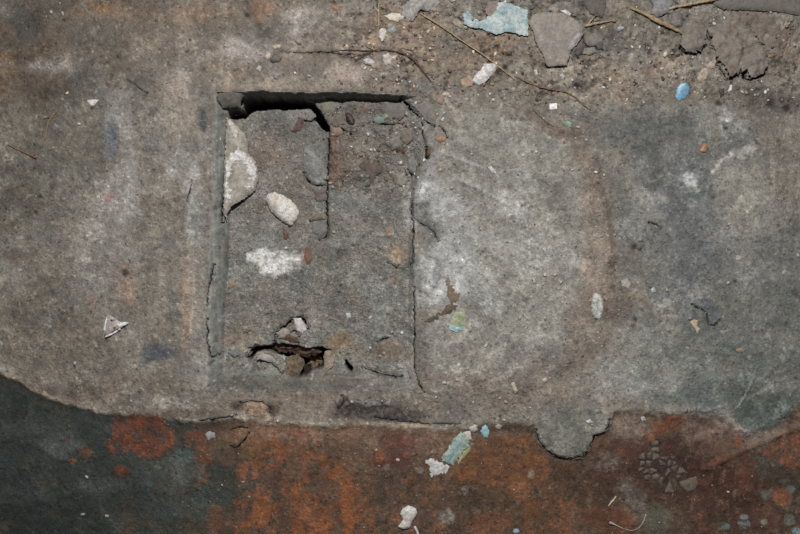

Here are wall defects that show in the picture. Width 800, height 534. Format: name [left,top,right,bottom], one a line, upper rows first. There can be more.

crack [204,265,219,359]
crack [362,166,439,393]
spalling [204,90,639,534]
rust [600,414,685,461]
rust [688,429,800,534]